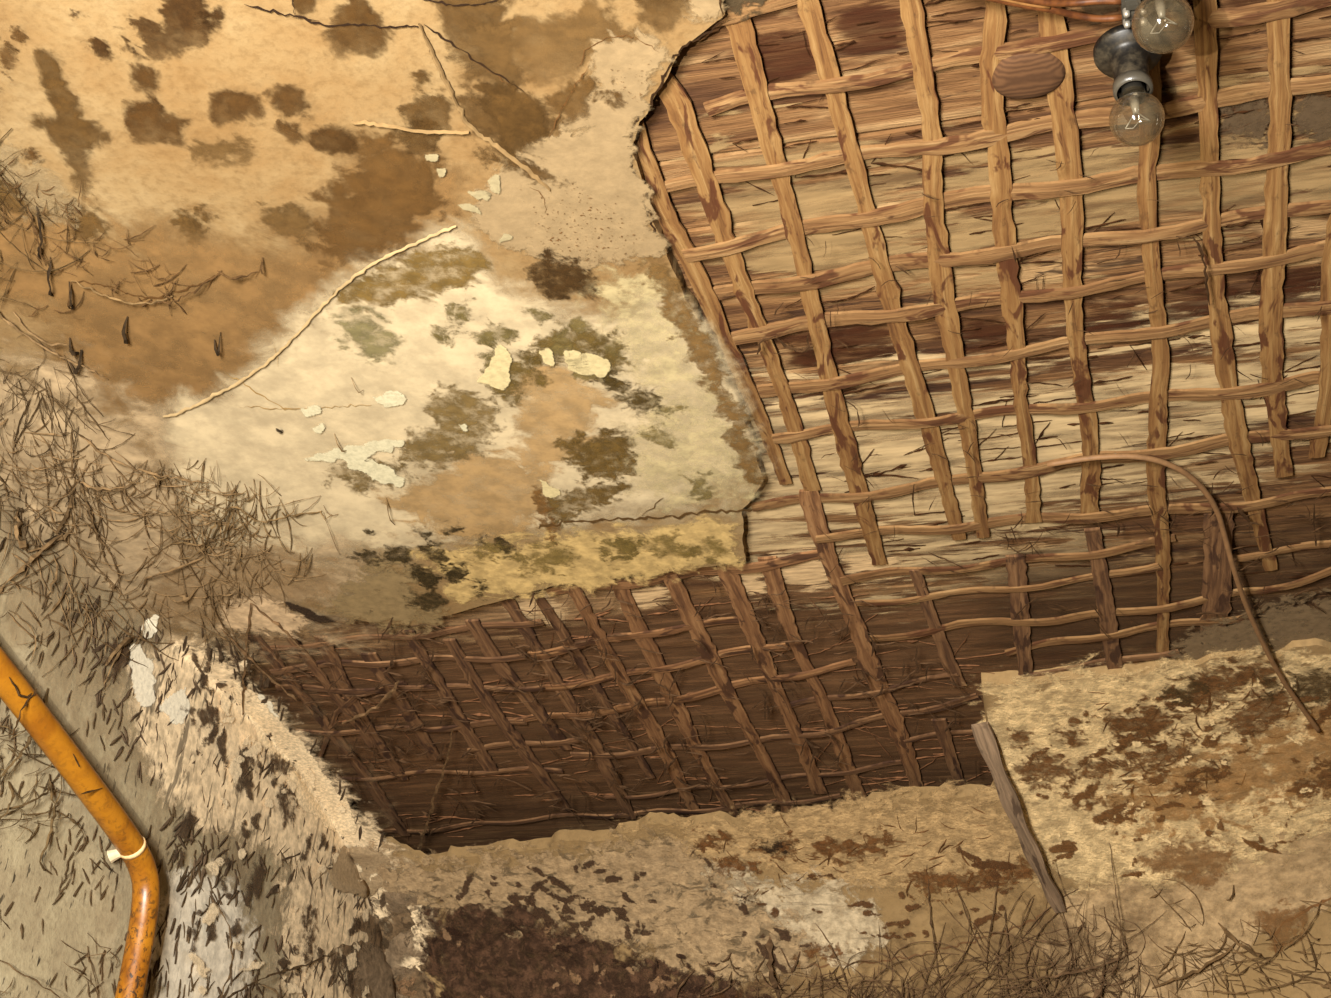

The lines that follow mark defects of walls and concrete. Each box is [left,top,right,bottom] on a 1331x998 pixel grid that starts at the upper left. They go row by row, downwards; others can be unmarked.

crack [244,0,524,92]
peeling [425,154,446,177]
flaking render [458,0,724,271]
crack [549,34,656,137]
peeling [305,439,404,488]
peeling [477,345,512,390]
peeling [539,348,611,378]
water stain [0,0,1152,856]
water stain [1165,289,1225,440]
water stain [1224,271,1268,428]
water stain [1282,266,1322,415]
water stain [1098,668,1331,890]